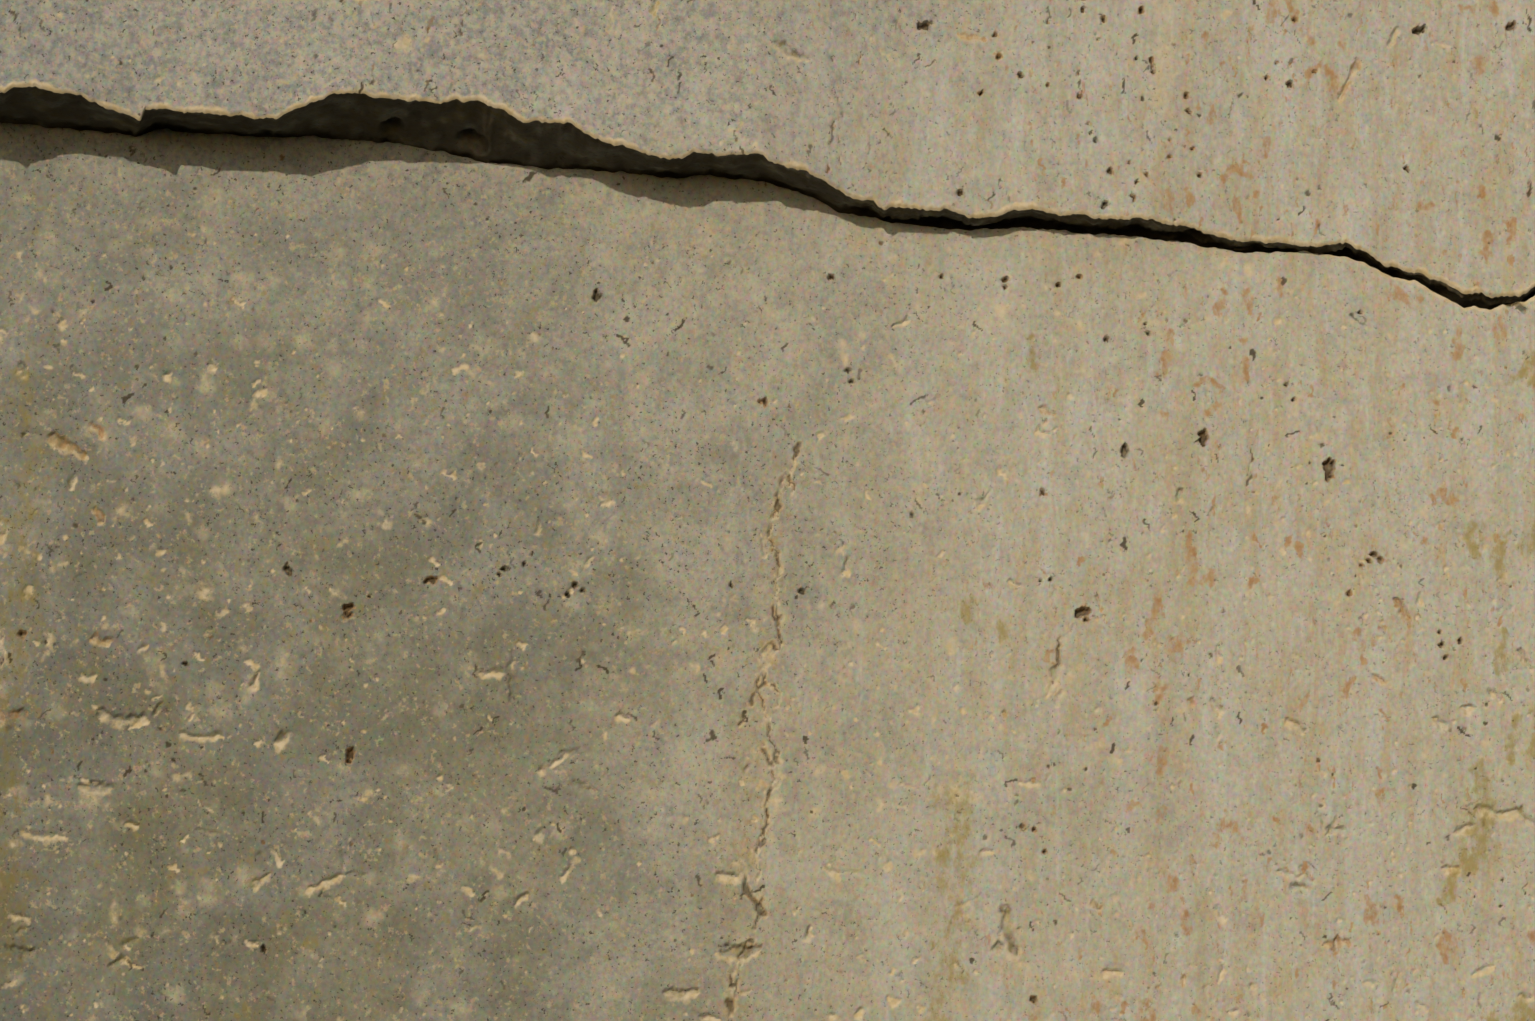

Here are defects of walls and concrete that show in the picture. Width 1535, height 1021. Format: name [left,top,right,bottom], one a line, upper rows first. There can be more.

crack [0,0,1535,315]
crack [717,438,806,1021]